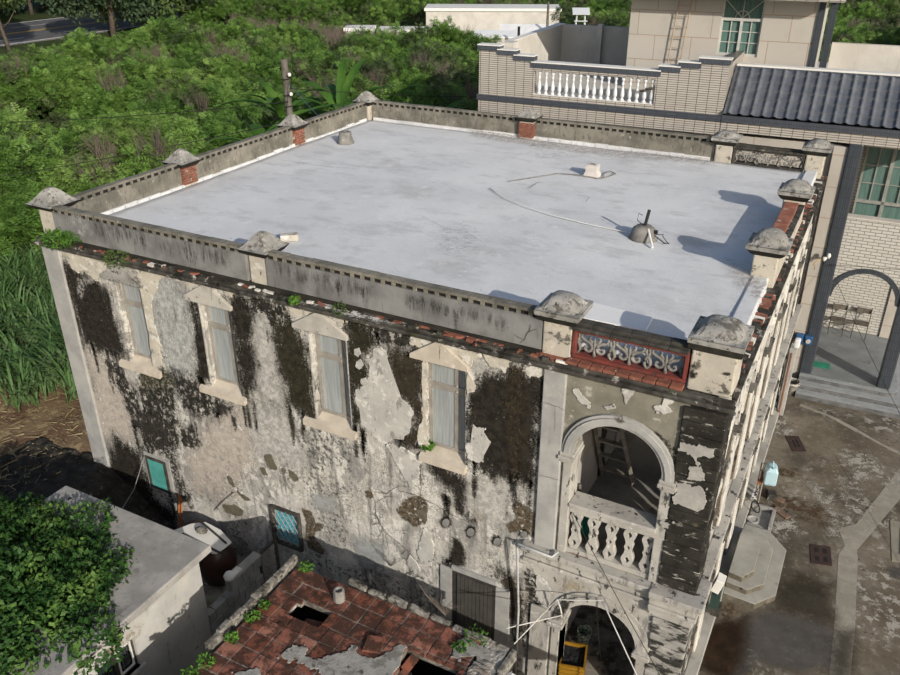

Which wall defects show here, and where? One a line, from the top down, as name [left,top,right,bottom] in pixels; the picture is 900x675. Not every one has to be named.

water stain [302,300,411,348]
water stain [62,259,290,527]
flaking render [573,388,591,409]
flaking render [604,388,635,410]
flaking render [654,398,674,414]
flaking render [354,347,430,527]
water stain [426,361,544,523]
flaking render [257,454,299,484]
flaking render [672,442,715,512]
flaking render [300,508,326,555]